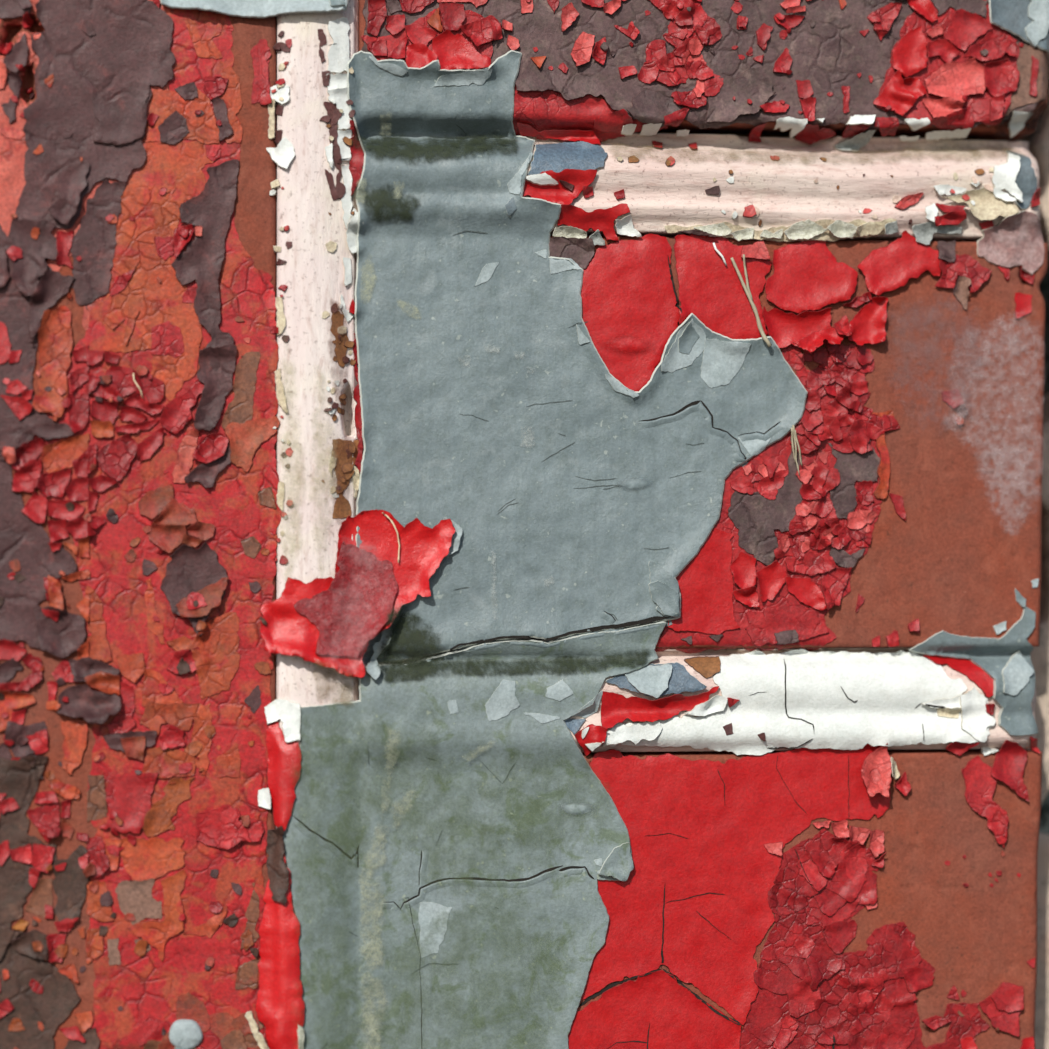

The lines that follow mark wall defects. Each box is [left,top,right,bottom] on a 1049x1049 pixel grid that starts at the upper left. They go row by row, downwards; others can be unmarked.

peeling [0,0,463,1049]
crack [576,476,621,489]
peeling [283,0,1049,1049]
crack [435,611,672,660]
crack [752,660,814,814]
crack [914,703,944,739]
crack [288,815,367,868]
crack [382,831,594,1049]
crack [579,886,741,1025]
crack [607,1024,650,1049]